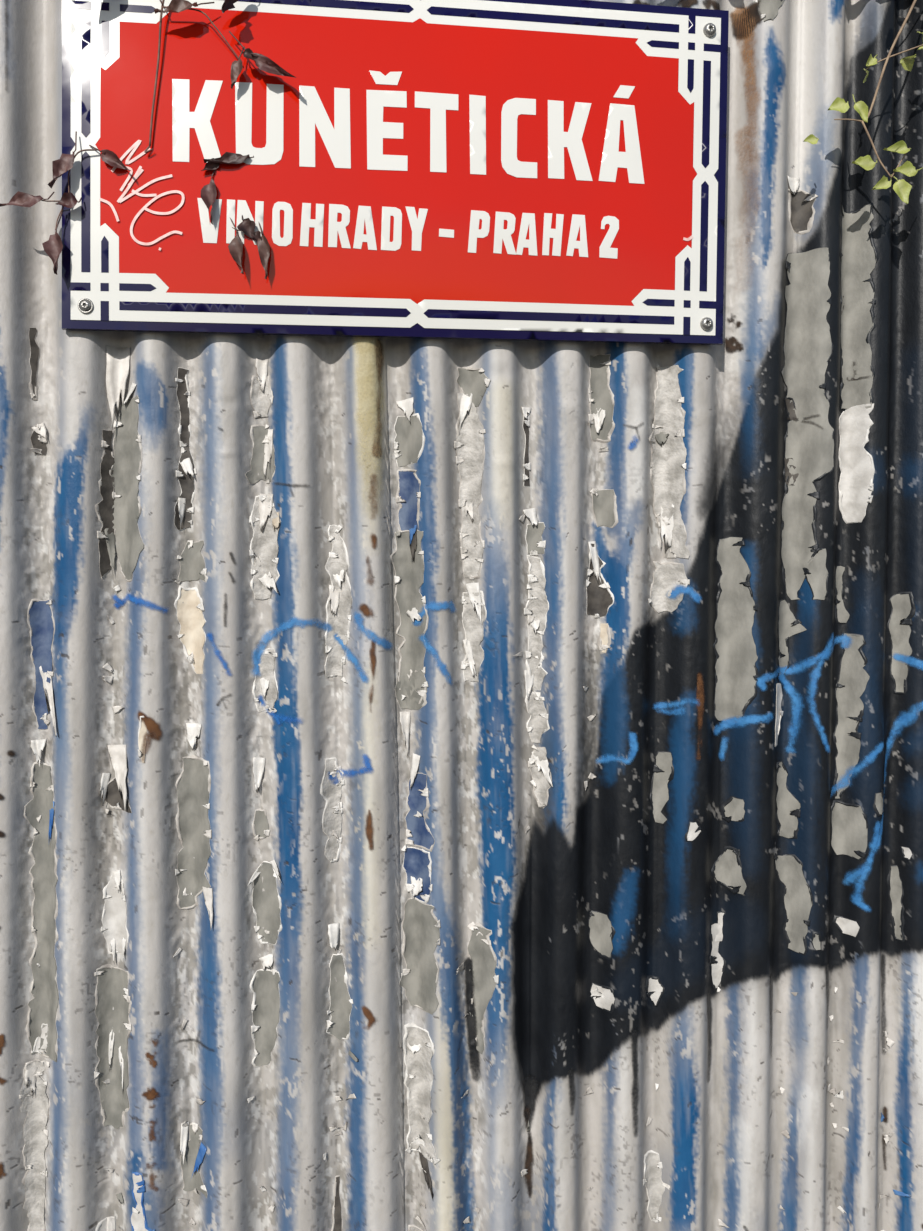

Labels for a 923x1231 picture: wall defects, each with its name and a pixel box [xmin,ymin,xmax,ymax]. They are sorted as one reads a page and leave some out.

peeling [95,346,144,592]
peeling [174,367,208,675]
peeling [390,397,441,1014]
peeling [648,365,690,613]
peeling [713,537,759,722]
peeling [775,202,884,861]
peeling [19,599,59,1231]
peeling [94,870,132,1129]
peeling [402,1023,440,1200]
peeling [774,853,822,955]
peeling [832,915,860,937]
peeling [887,846,913,942]